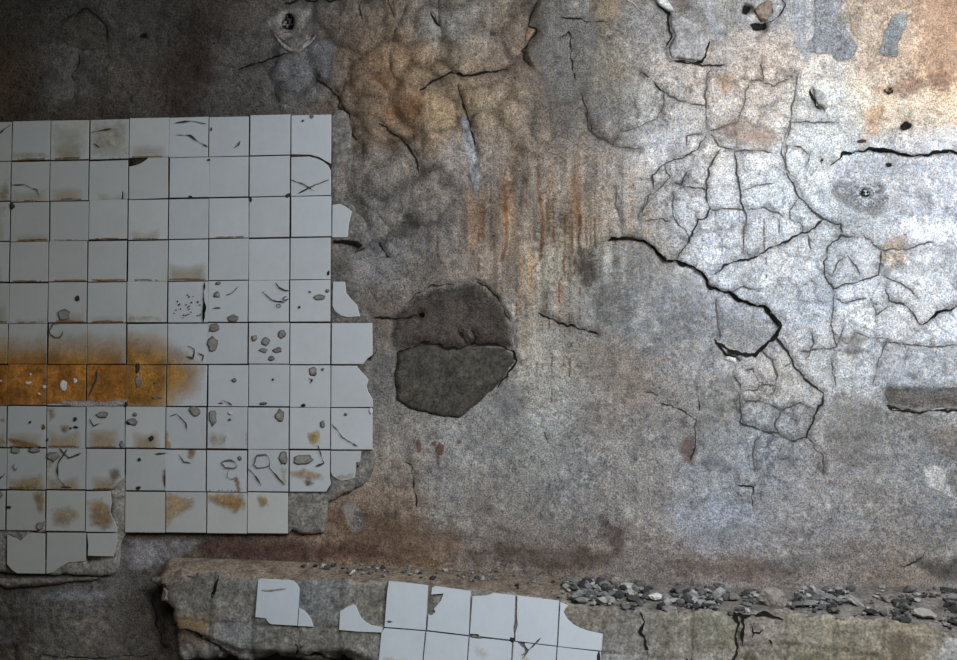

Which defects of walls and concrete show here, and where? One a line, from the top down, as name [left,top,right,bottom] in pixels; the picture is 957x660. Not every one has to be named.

crack [420,0,539,146]
crack [379,123,420,173]
crack [291,179,327,194]
crack [560,3,957,508]
crack [374,281,511,321]
spalling [393,286,510,347]
crack [538,312,598,334]
corrosion [0,343,192,412]
crack [398,329,518,387]
spalling [885,388,957,411]
spalling [342,502,364,531]
crack [43,601,230,659]